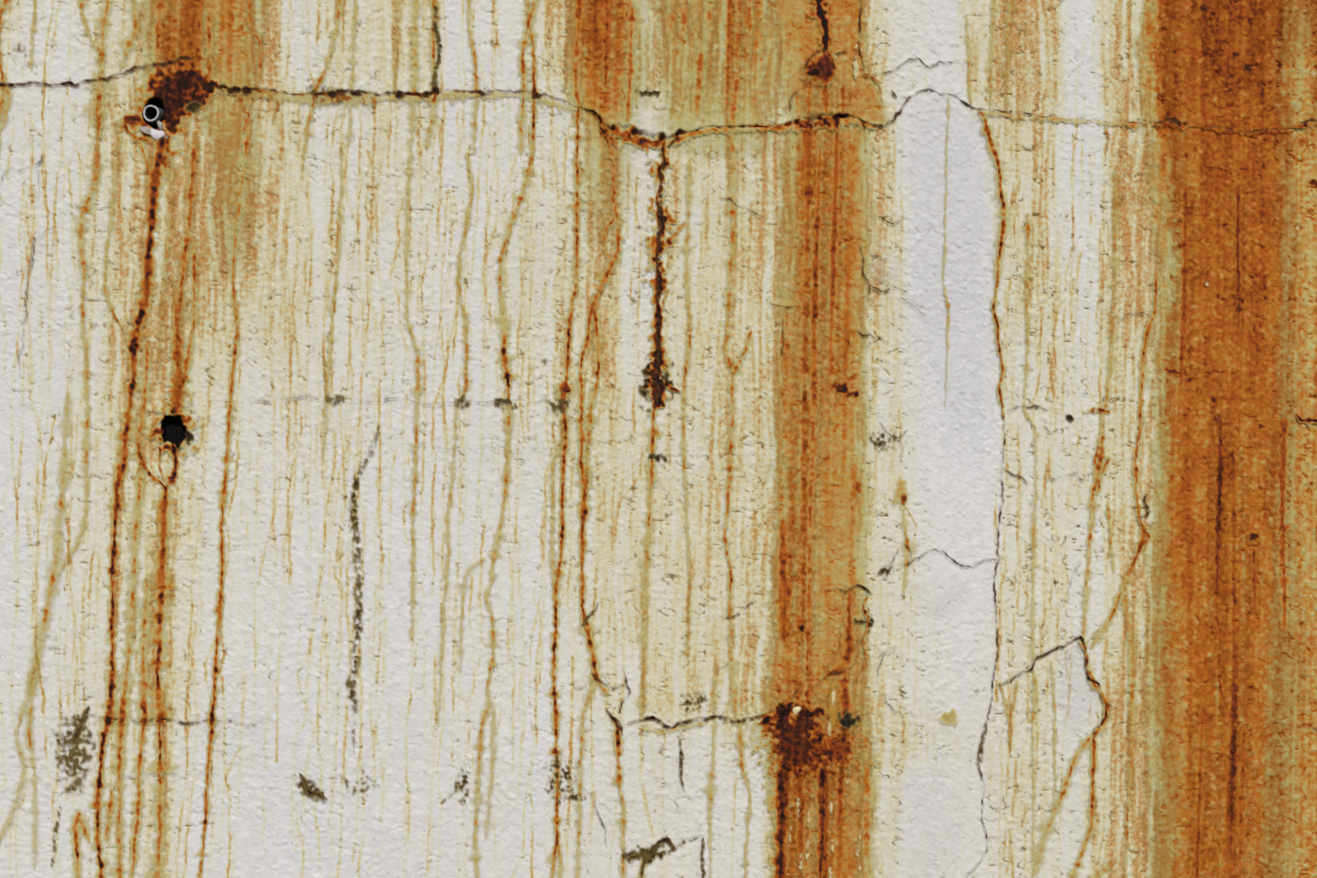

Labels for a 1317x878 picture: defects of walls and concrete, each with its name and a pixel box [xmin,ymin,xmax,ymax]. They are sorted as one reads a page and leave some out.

crack [16,230,50,361]
crack [0,56,193,87]
corrosion [0,0,266,878]
crack [214,0,951,411]
crack [581,603,598,626]
crack [593,674,779,735]
corrosion [548,0,885,878]
crack [839,100,1317,874]
corrosion [999,0,1317,878]